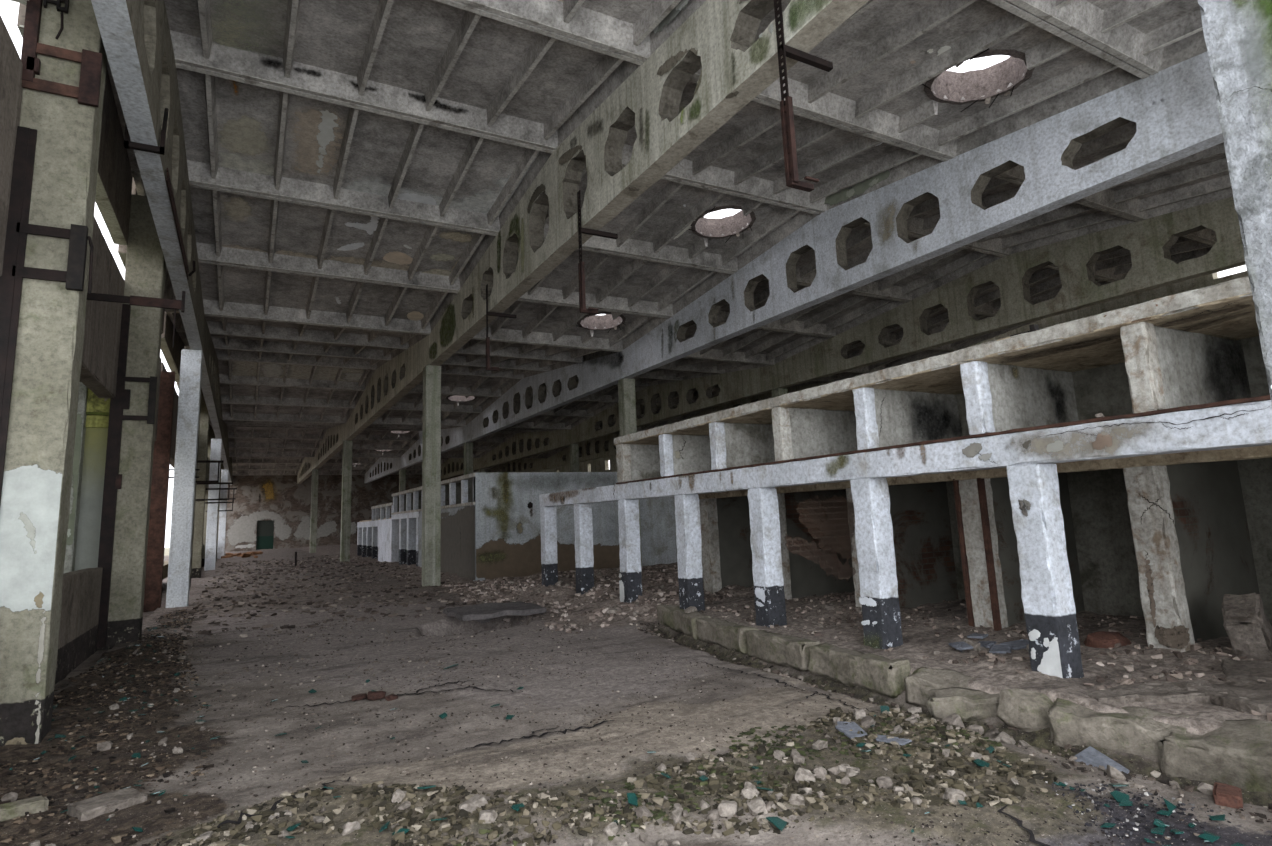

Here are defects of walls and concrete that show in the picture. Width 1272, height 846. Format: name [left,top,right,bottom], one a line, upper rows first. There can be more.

peeling [962,442,998,464]
peeling [1011,422,1148,459]
peeling [0,414,83,745]
peeling [1028,629,1063,678]
crack [988,799,1050,846]